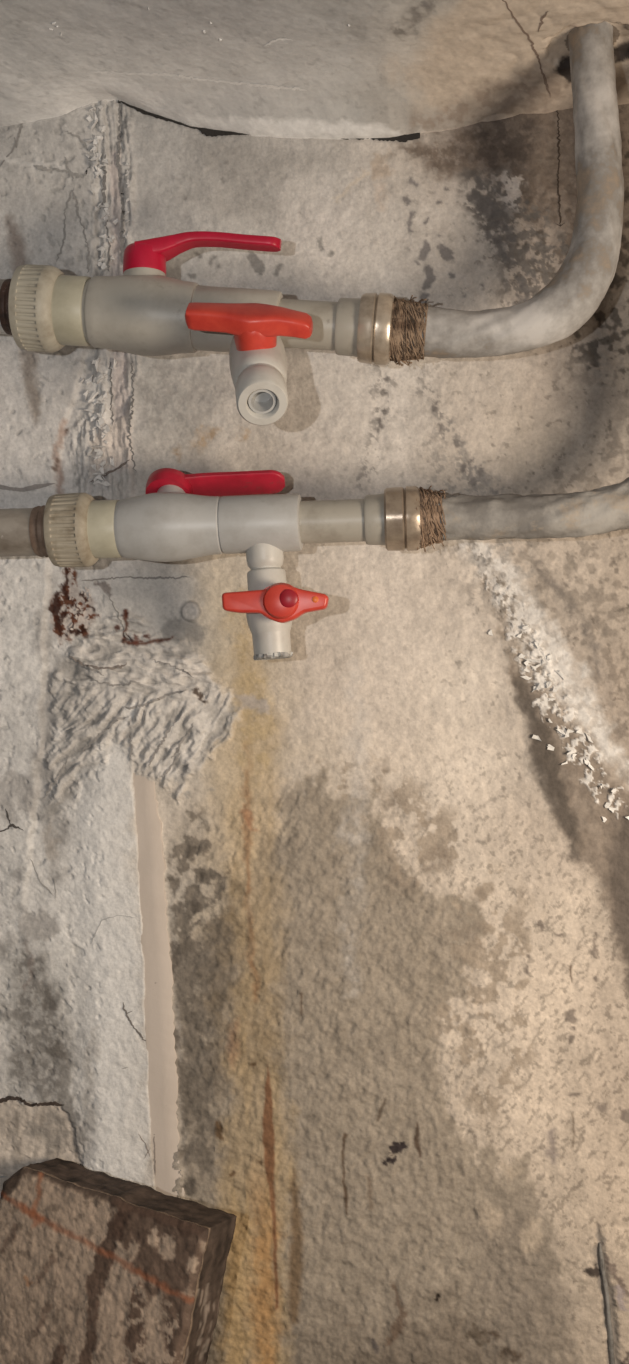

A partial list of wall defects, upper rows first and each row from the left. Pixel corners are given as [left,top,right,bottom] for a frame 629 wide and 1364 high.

peeling [84,100,131,271]
crack [0,71,307,273]
crack [345,133,420,142]
water stain [182,0,629,305]
crack [502,0,564,227]
peeling [61,356,134,486]
corrosion [46,567,175,649]
spalling [190,685,209,706]
water stain [445,538,629,1013]
water stain [163,785,238,1208]
corrosion [210,611,305,1364]
water stain [278,653,629,1364]